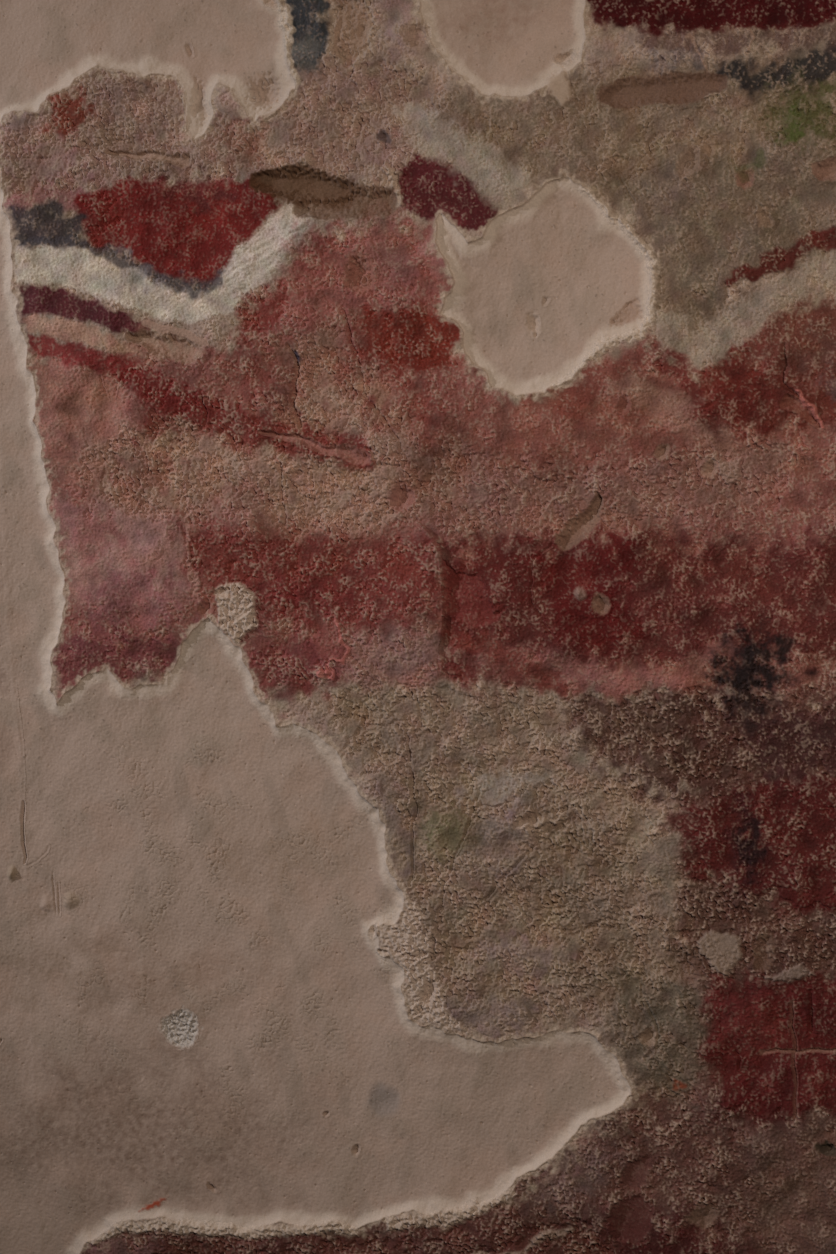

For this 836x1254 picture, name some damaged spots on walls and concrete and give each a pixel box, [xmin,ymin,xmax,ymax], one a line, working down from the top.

spalling [4,0,436,224]
spalling [593,68,731,112]
spalling [548,184,663,389]
spalling [124,318,209,367]
spalling [85,366,397,537]
spalling [207,581,260,646]
spalling [563,681,742,809]
spalling [367,891,470,1035]
spalling [668,885,836,985]
peeling [156,1005,202,1051]
spalling [85,1217,360,1246]
spalling [384,1186,657,1254]